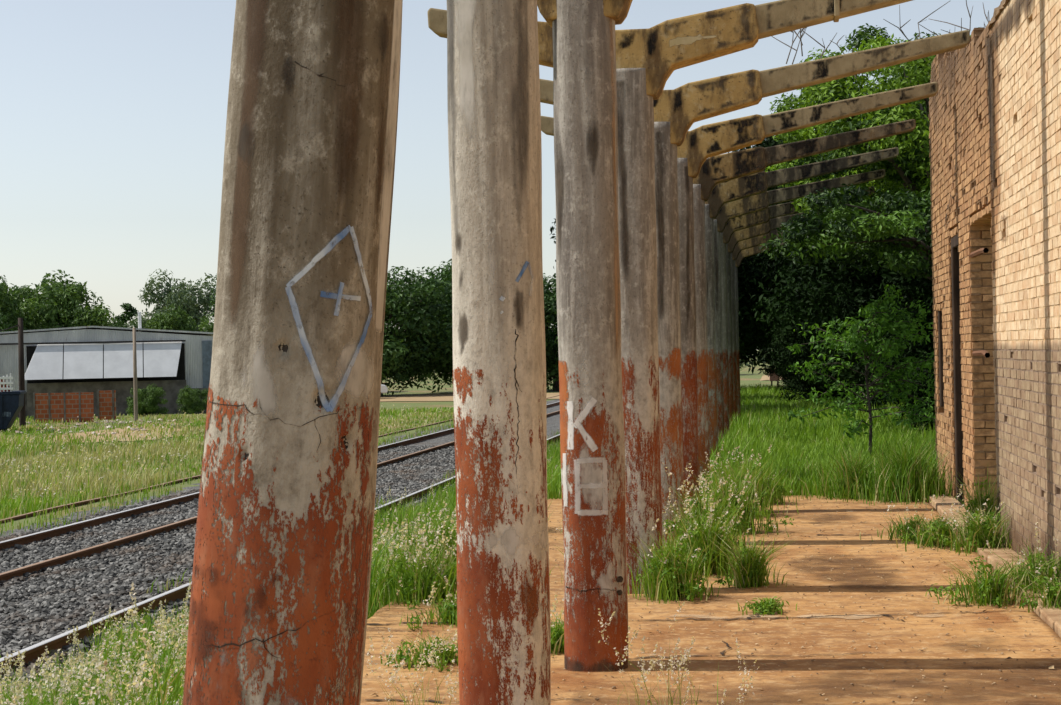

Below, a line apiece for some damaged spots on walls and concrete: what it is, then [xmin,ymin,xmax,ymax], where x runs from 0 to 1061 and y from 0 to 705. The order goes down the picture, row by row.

peeling [456,0,476,133]
water stain [813,60,831,78]
water stain [231,0,266,317]
water stain [617,81,628,271]
water stain [690,117,836,229]
water stain [656,194,664,313]
crack [210,399,278,421]
crack [514,330,522,474]
peeling [183,345,376,705]
peeling [452,366,551,705]
peeling [558,348,741,672]
crack [209,628,300,658]